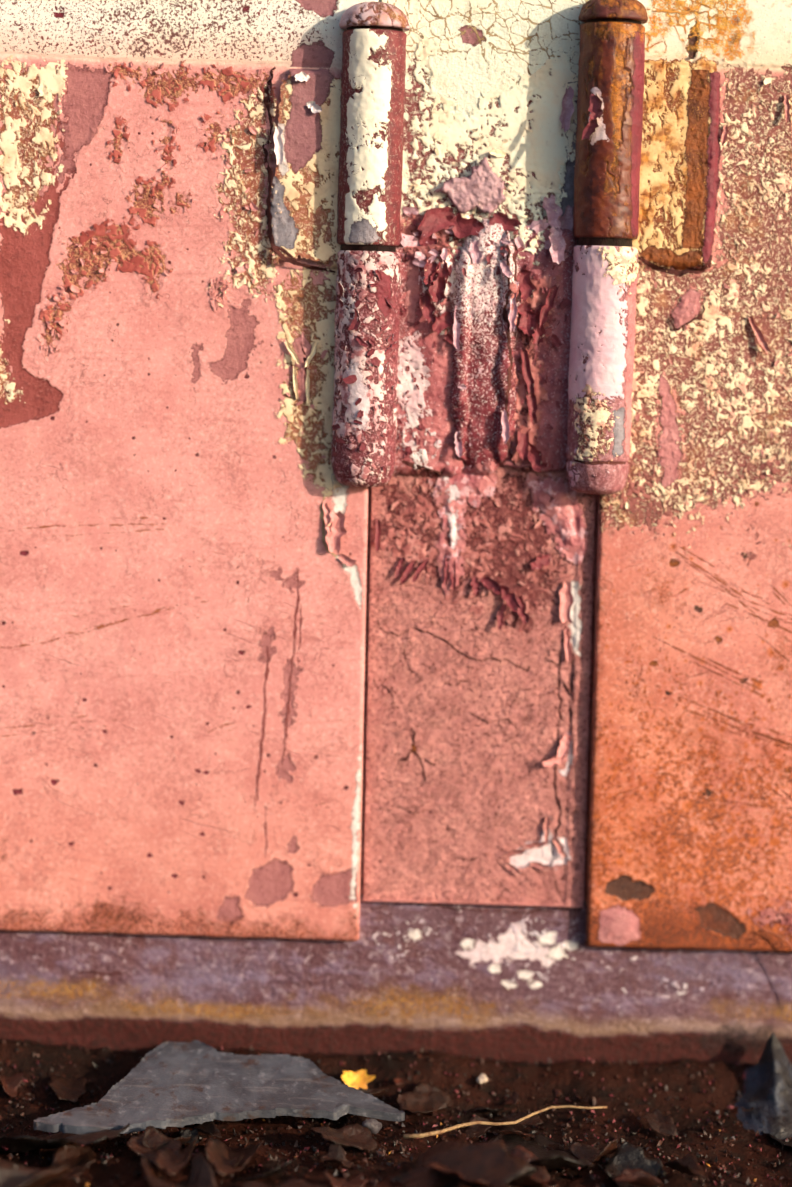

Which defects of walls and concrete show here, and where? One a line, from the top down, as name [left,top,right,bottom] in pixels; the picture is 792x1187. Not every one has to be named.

peeling [295,0,338,18]
peeling [458,25,486,47]
crack [387,0,589,85]
crack [645,0,736,53]
peeling [571,31,792,571]
peeling [0,34,609,662]
peeling [499,814,572,876]
rust [587,876,792,952]
peeling [695,900,792,944]